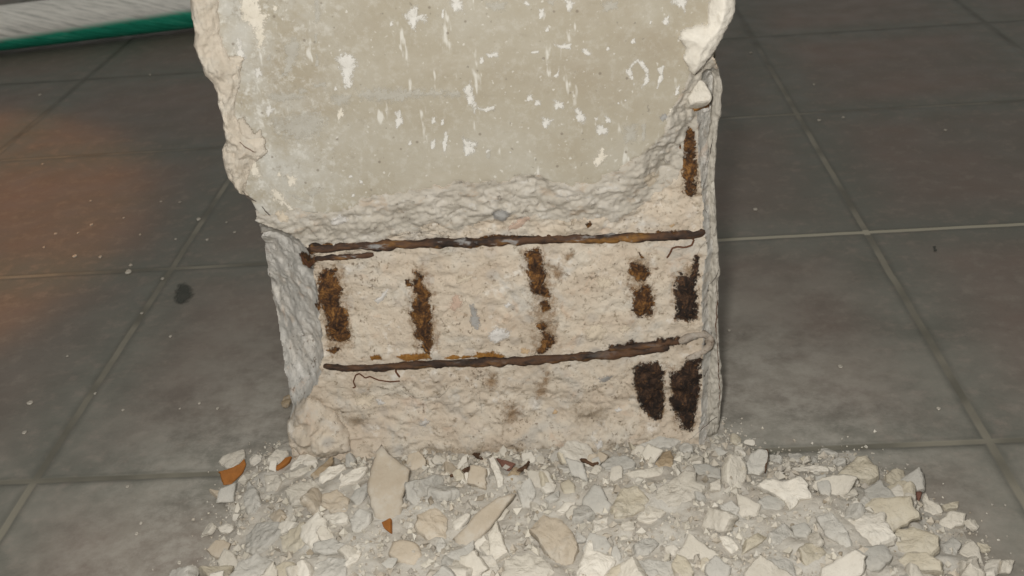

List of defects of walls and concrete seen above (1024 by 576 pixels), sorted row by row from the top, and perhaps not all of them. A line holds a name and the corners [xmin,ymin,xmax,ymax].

rust [679,127,699,197]
rust [299,242,351,354]
rust [397,270,435,362]
spalling [255,0,735,509]
rust [523,247,560,354]
rust [627,252,655,319]
rust [673,255,701,323]
rust [445,351,506,360]
rust [632,358,703,432]